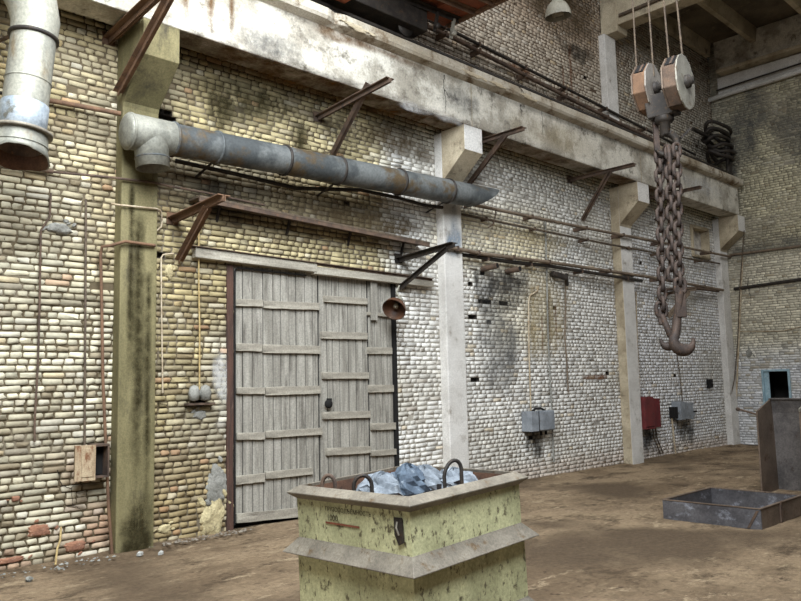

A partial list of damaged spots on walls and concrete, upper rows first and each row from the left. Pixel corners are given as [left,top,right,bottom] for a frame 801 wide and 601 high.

damp [128,188,150,448]
damp [123,506,150,552]
spalling [197,455,234,535]